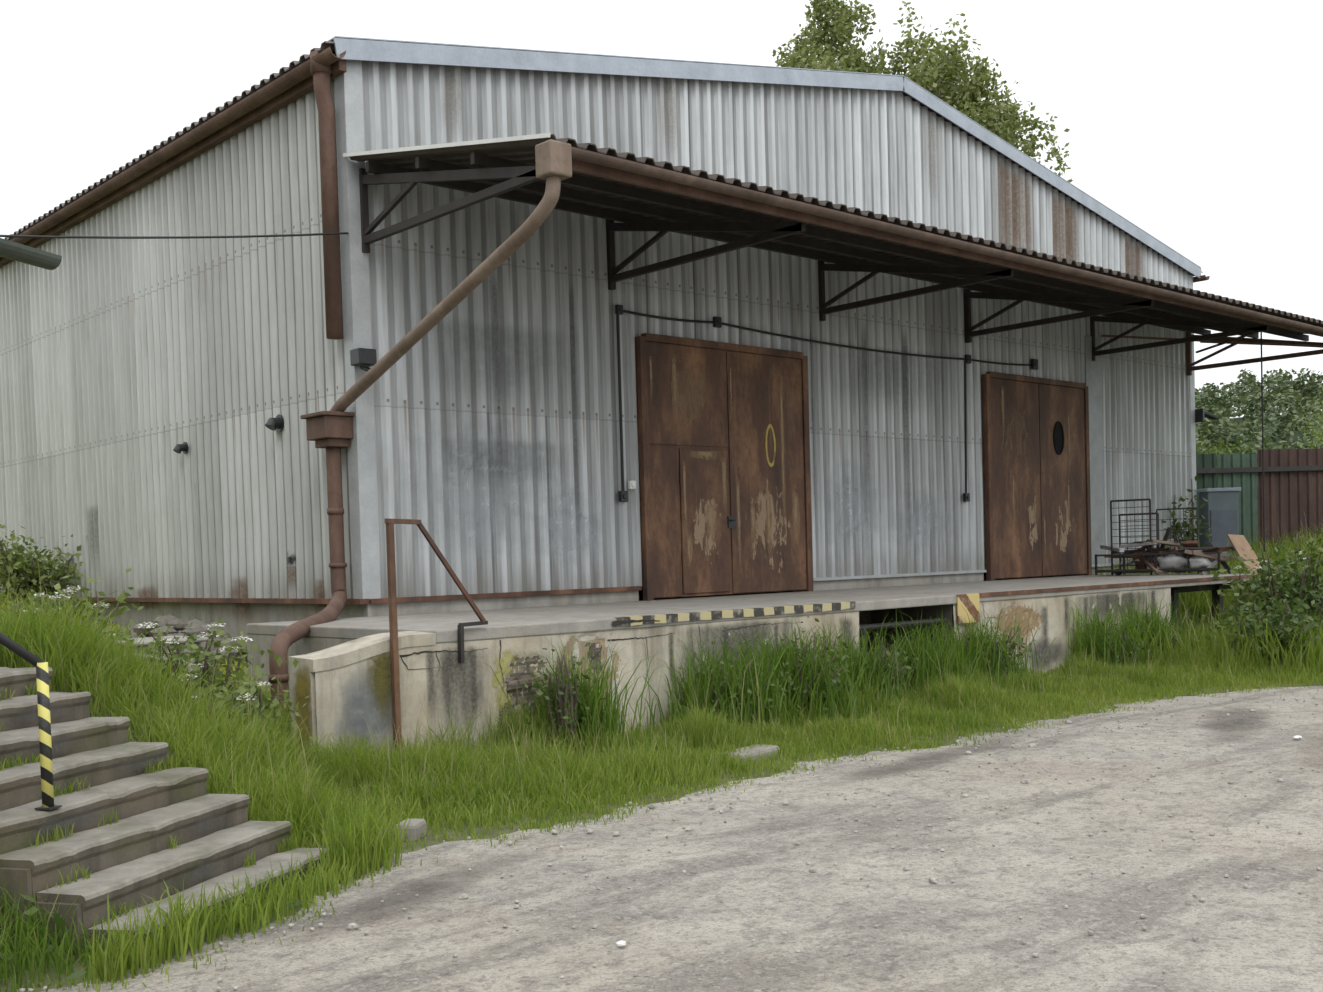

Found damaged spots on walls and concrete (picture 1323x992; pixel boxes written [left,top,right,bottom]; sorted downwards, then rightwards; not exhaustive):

peeling [683,390,799,573]
leakage [345,657,393,743]
leakage [428,651,481,720]